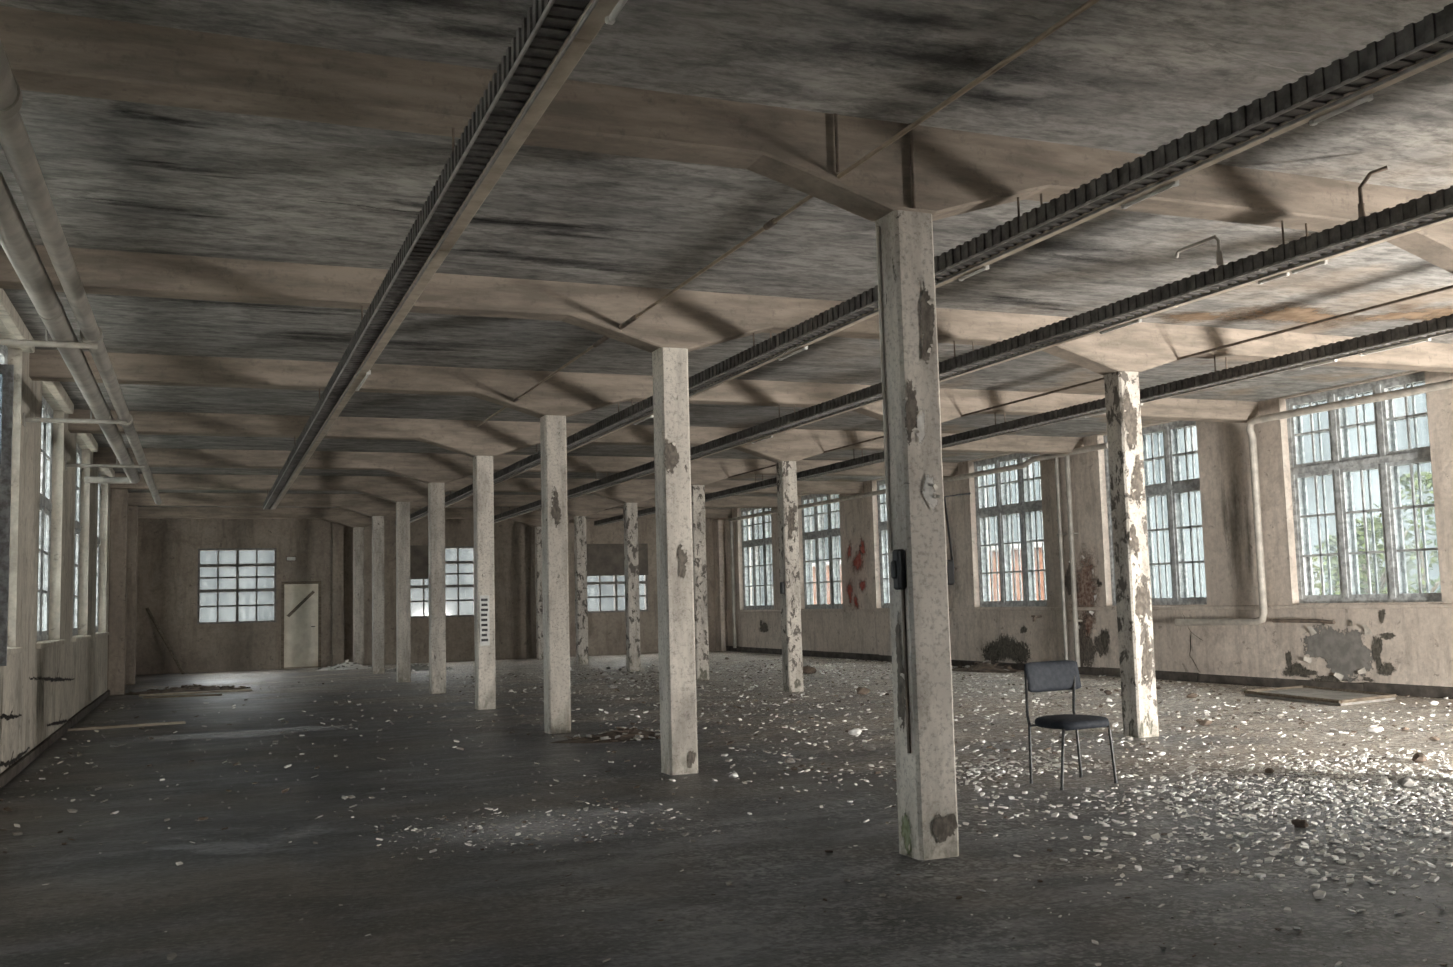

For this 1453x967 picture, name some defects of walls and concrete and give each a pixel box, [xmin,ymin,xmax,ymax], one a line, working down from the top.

peeling [920,281,935,364]
peeling [904,380,925,443]
peeling [1122,389,1144,505]
peeling [1129,525,1140,558]
flaking render [1065,555,1098,638]
peeling [1135,583,1153,683]
flaking render [1301,619,1396,683]